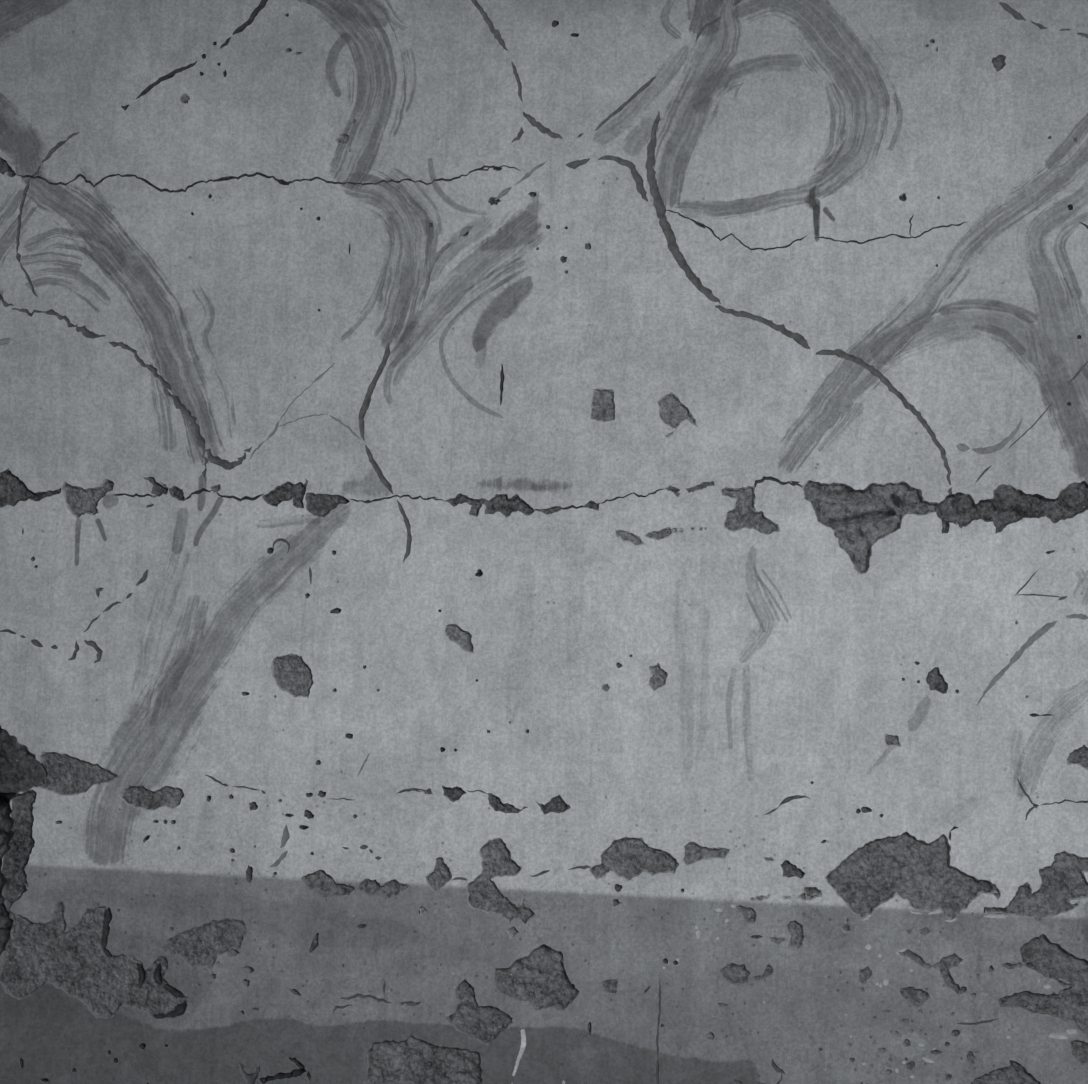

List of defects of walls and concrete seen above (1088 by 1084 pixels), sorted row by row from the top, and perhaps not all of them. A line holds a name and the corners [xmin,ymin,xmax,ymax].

crack [0,0,1088,563]
flaking render [802,480,1088,574]
flaking render [271,654,314,698]
flaking render [1066,745,1088,770]
flaking render [278,790,327,830]
flaking render [0,725,247,1020]
flaking render [425,857,452,892]
flaking render [466,838,537,940]
flaking render [589,837,730,906]
flaking render [494,944,579,1011]
flaking render [763,831,1088,1065]
flaking render [364,978,513,1084]